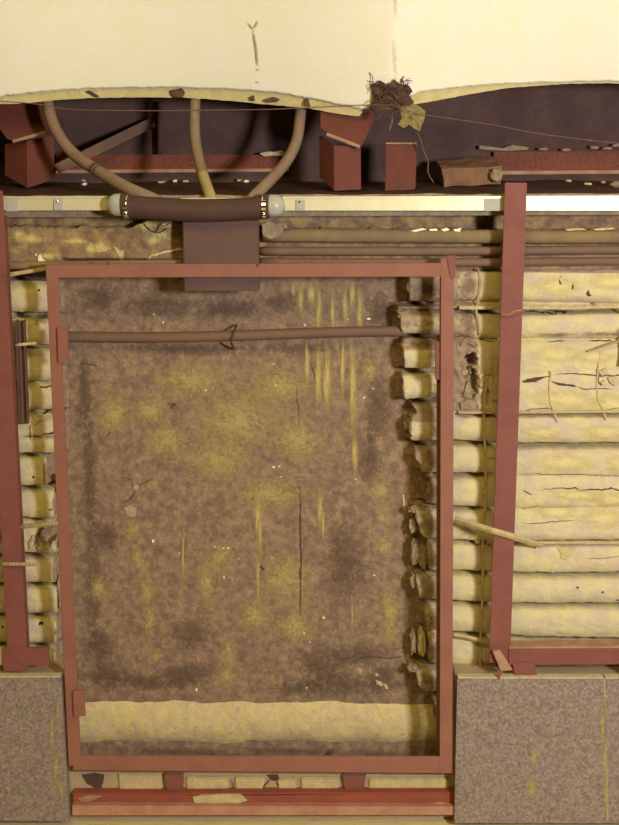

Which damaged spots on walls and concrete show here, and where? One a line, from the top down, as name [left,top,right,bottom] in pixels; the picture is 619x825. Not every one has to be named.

crack [249,22,259,83]
spalling [170,88,185,98]
spalling [366,73,426,131]
damp [270,284,363,328]
spalling [523,302,619,310]
damp [340,340,377,425]
peeling [458,358,498,414]
crack [522,373,619,390]
damp [100,344,330,643]
damp [352,439,393,557]
crack [522,473,619,524]
crack [296,487,304,615]